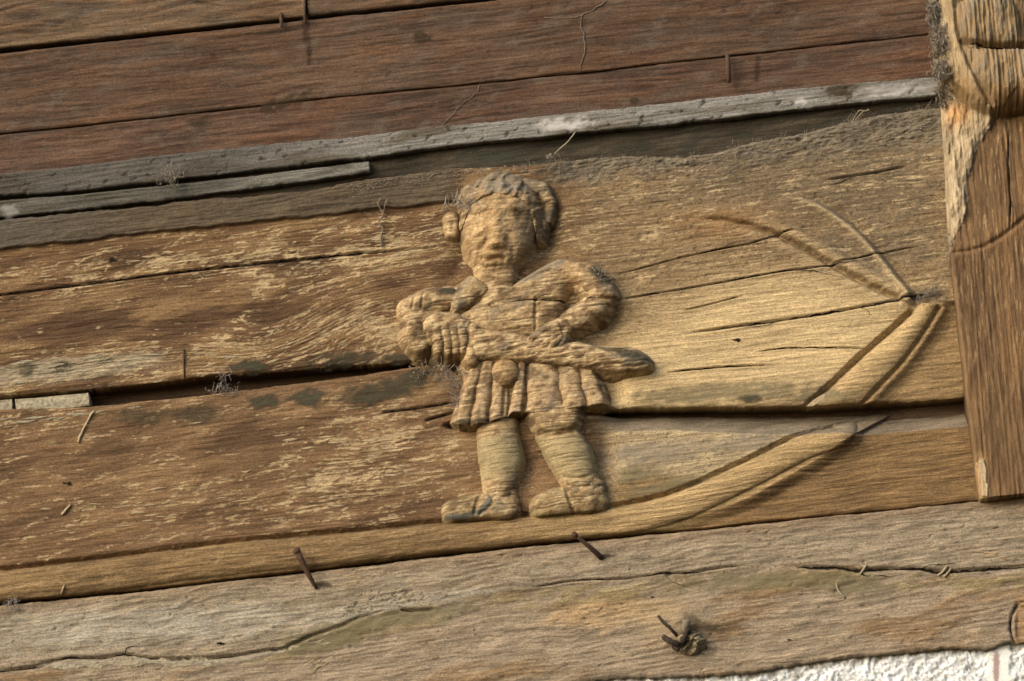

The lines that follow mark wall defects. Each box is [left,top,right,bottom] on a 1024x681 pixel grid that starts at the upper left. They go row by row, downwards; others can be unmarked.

crack [632,227,805,271]
crack [509,243,932,373]
crack [795,563,1024,577]